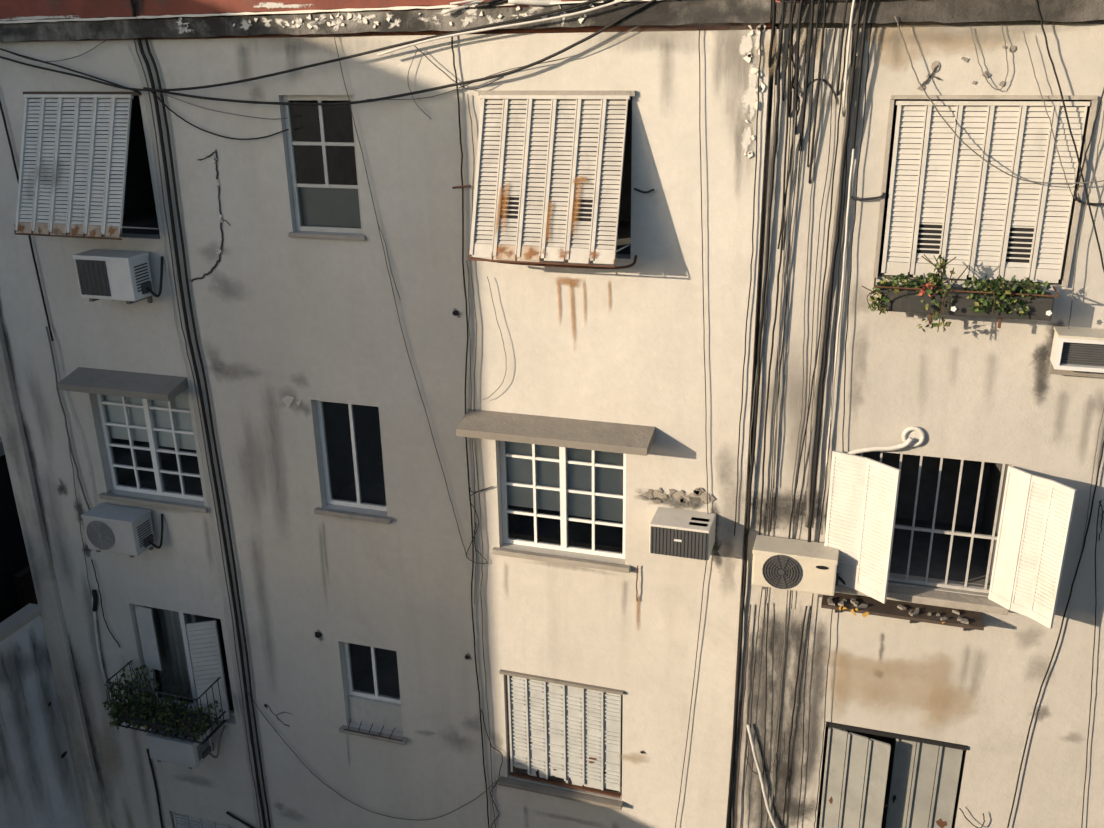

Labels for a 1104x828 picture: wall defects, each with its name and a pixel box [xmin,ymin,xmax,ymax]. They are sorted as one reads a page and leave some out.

peeling [233,13,400,30]
peeling [419,3,594,27]
peeling [739,23,766,159]
rust [14,225,122,240]
crack [191,150,230,282]
rust [497,185,508,225]
rust [468,247,616,268]
rust [573,177,586,221]
damp [763,149,772,326]
rust [557,279,585,333]
peeling [645,487,715,504]
damp [730,621,822,828]